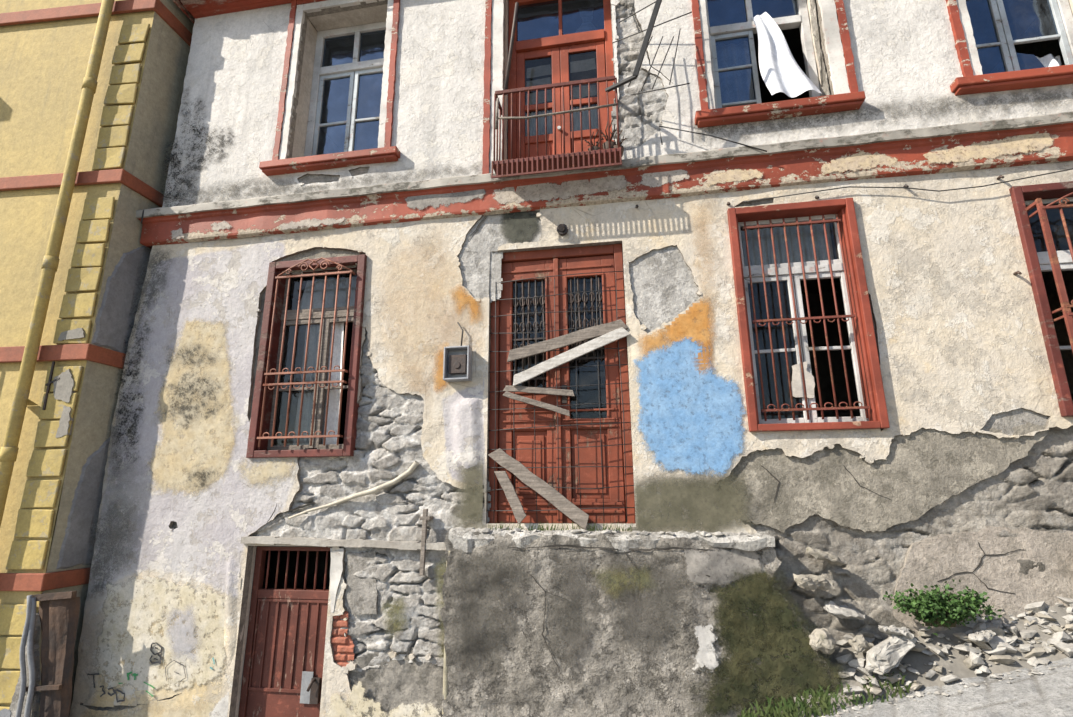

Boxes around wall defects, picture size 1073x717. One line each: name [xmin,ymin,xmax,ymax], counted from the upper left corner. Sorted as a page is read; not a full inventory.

flaking render [610,0,668,151]
damp [164,95,327,207]
peeling [821,151,898,175]
peeling [923,133,1054,164]
flaking render [405,175,626,303]
damp [169,344,222,426]
flaking render [242,322,491,717]
crack [761,465,780,503]
flaking render [684,408,1073,660]
crack [937,542,1024,594]
peeling [91,576,229,717]
damp [720,572,783,684]